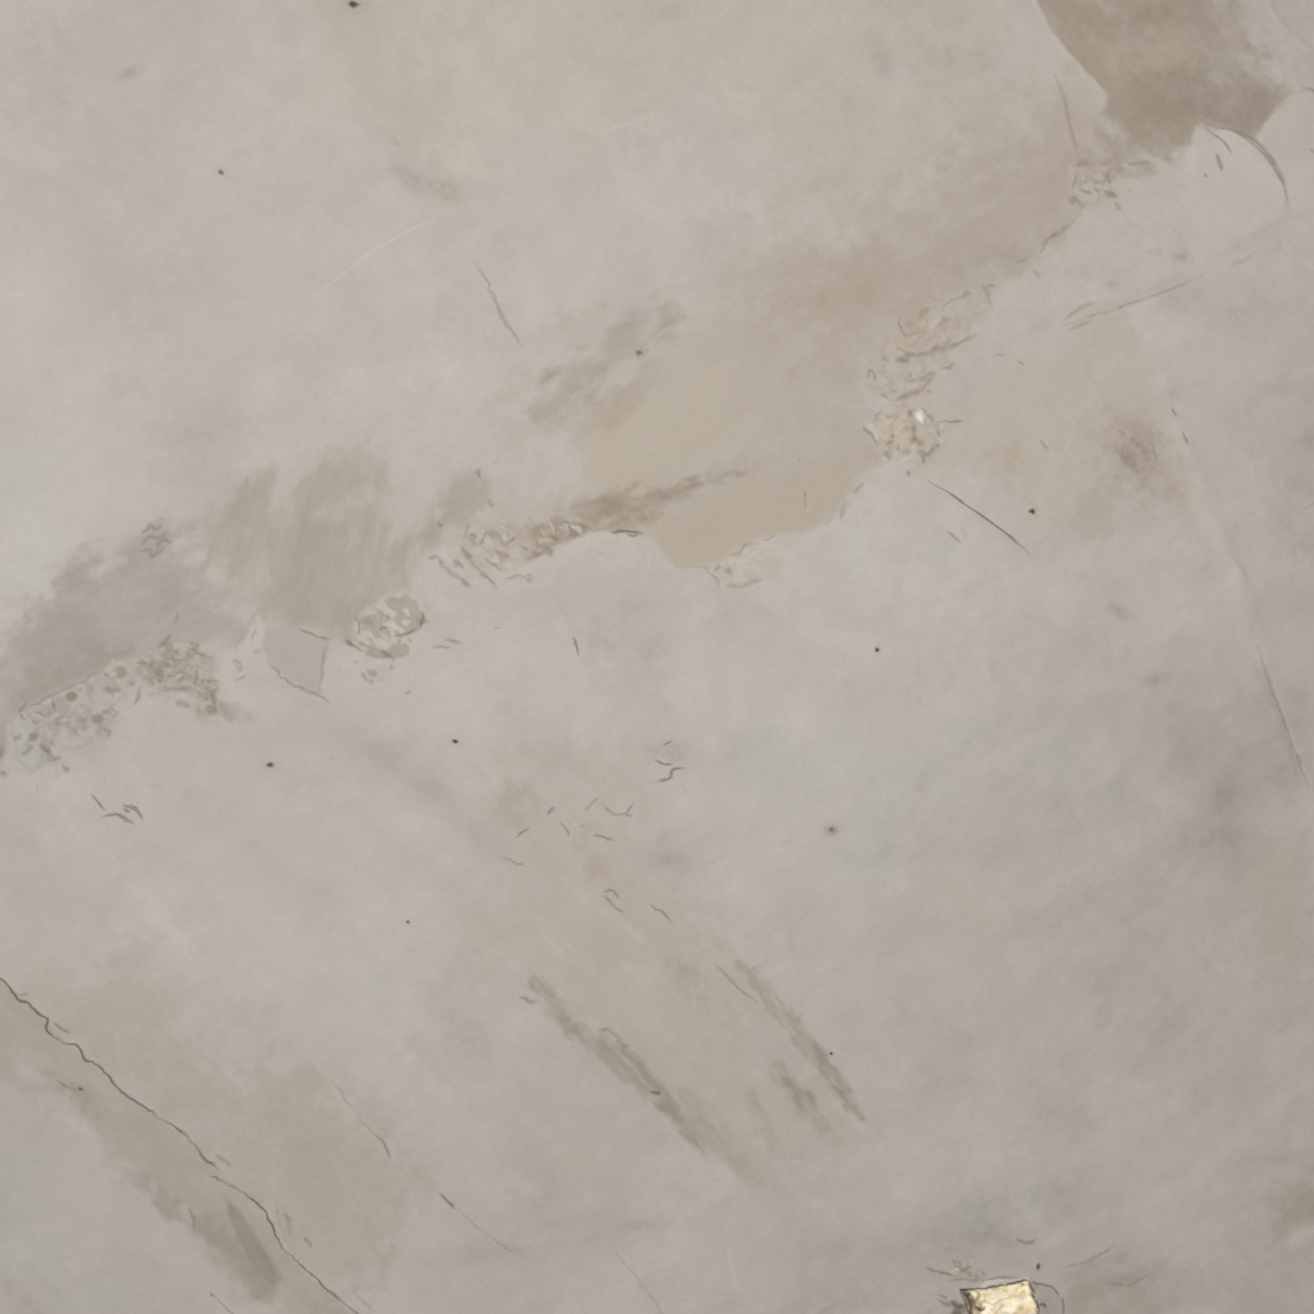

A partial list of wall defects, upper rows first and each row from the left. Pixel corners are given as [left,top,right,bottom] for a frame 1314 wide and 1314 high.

leakage [0,0,1299,762]
spalling [859,398,964,478]
spalling [428,496,671,593]
spalling [0,589,462,790]
leakage [432,701,869,1214]
crack [0,978,360,1314]
crack [333,1083,392,1159]
crack [439,1192,532,1252]